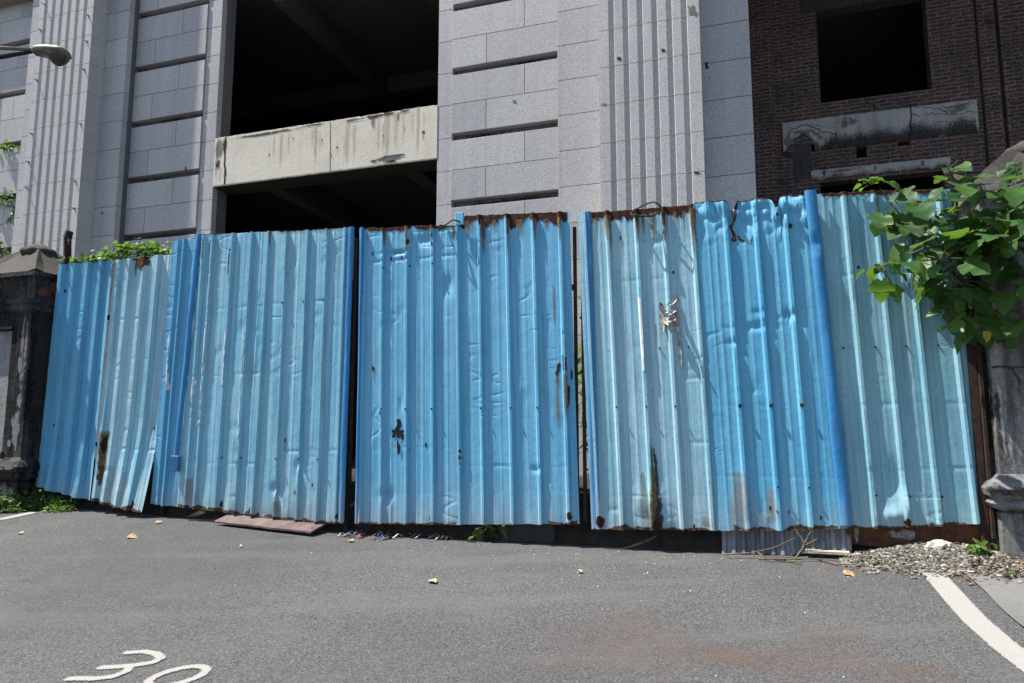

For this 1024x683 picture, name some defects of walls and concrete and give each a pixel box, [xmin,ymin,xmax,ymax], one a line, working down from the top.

damp [824,105,977,148]
corrosion [364,211,568,260]
corrosion [591,198,766,250]
corrosion [91,431,140,512]
corrosion [734,506,981,542]